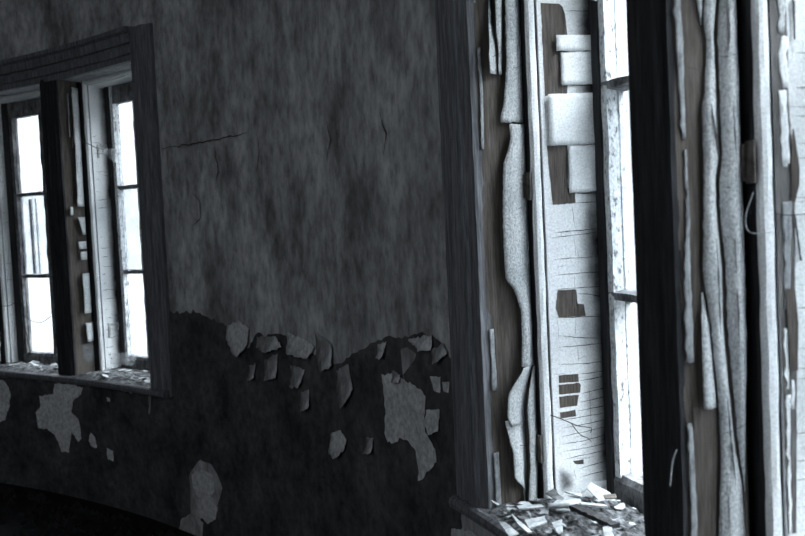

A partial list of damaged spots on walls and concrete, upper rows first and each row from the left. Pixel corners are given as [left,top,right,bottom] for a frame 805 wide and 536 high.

peeling [477,0,644,536]
crack [554,192,603,477]
peeling [672,0,686,139]
peeling [683,0,747,536]
peeling [769,0,802,534]